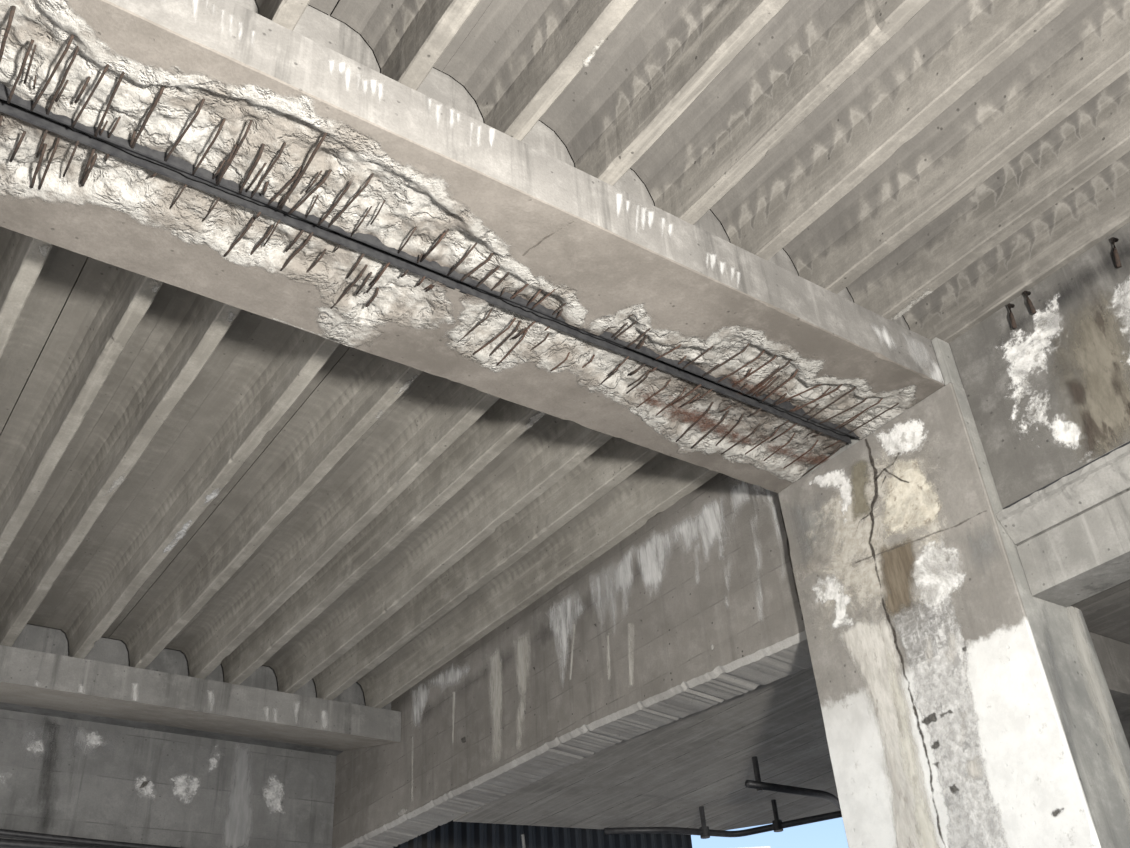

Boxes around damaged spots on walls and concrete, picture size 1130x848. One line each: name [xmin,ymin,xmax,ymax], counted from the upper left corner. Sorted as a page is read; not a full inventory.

spalling [0,0,917,483]
spalling [893,289,932,319]
damp [1001,274,1130,455]
rust [643,396,749,443]
rust [769,444,828,463]
efflorescence [597,504,723,604]
crack [780,505,803,620]
damp [796,420,965,627]
crack [856,439,962,839]
efflorescence [413,666,468,730]
damp [171,746,220,803]
damp [224,746,284,848]